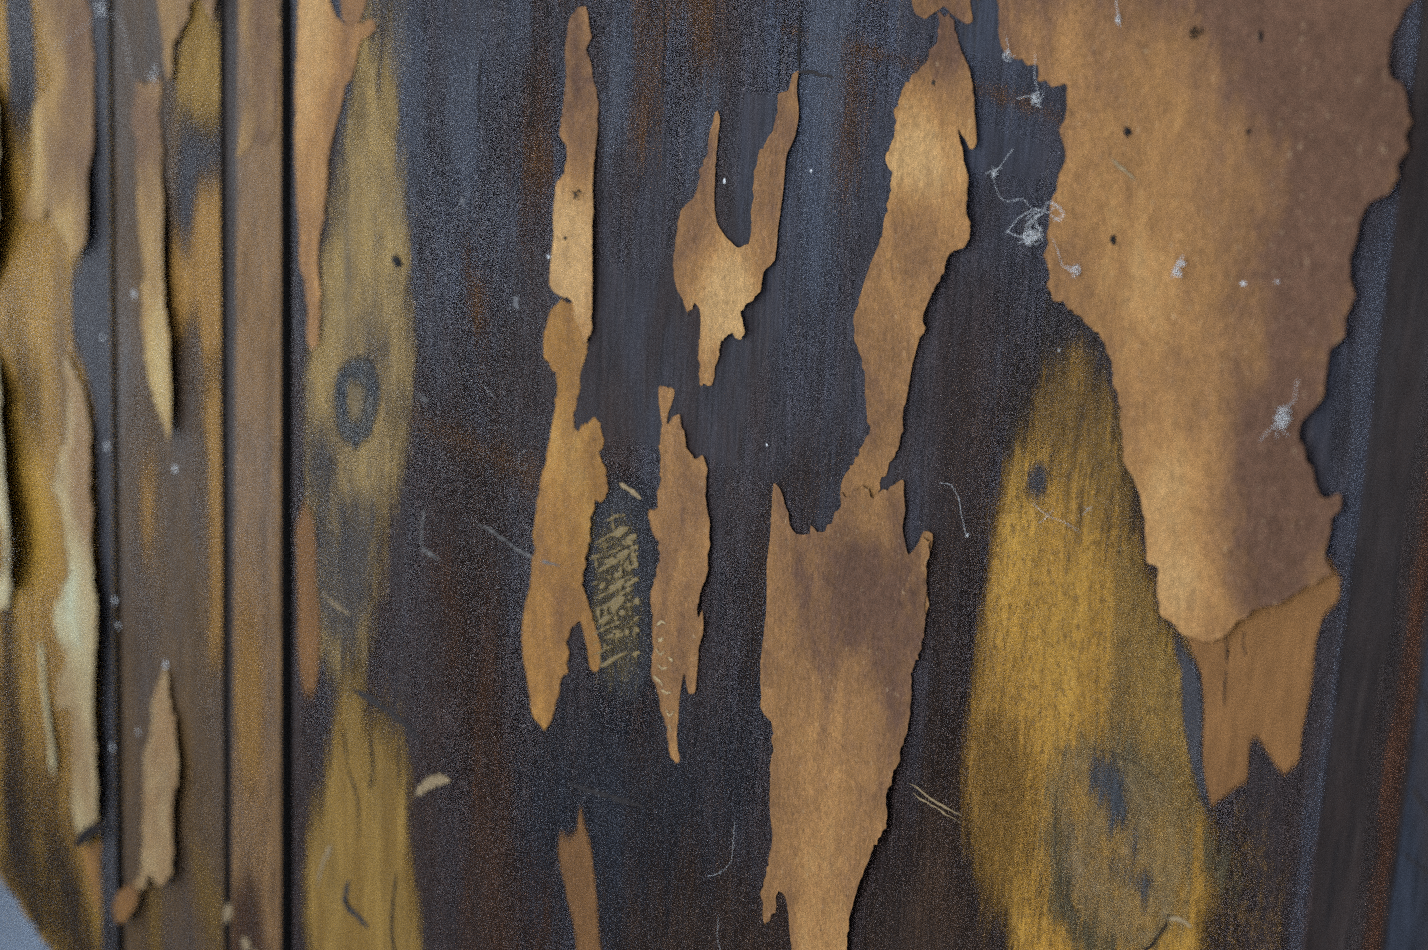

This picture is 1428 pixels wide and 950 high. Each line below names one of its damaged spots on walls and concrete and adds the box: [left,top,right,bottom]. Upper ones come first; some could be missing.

peeling [176,0,220,140]
water stain [1028,467,1045,498]
water stain [309,421,376,686]
peeling [920,537,931,615]
water stain [1176,642,1210,811]